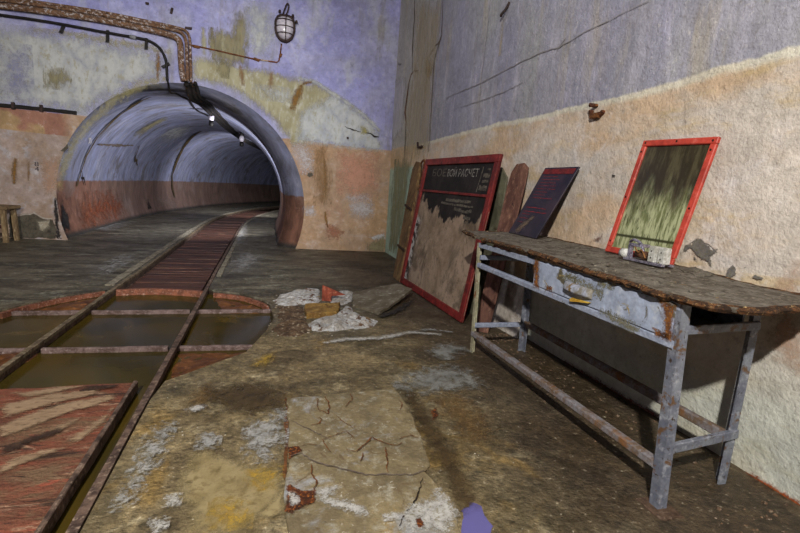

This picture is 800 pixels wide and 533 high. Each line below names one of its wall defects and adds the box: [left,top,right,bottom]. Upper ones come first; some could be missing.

crack [345,126,379,138]
crack [404,0,648,165]
peeling [655,238,718,277]
crack [282,393,425,526]